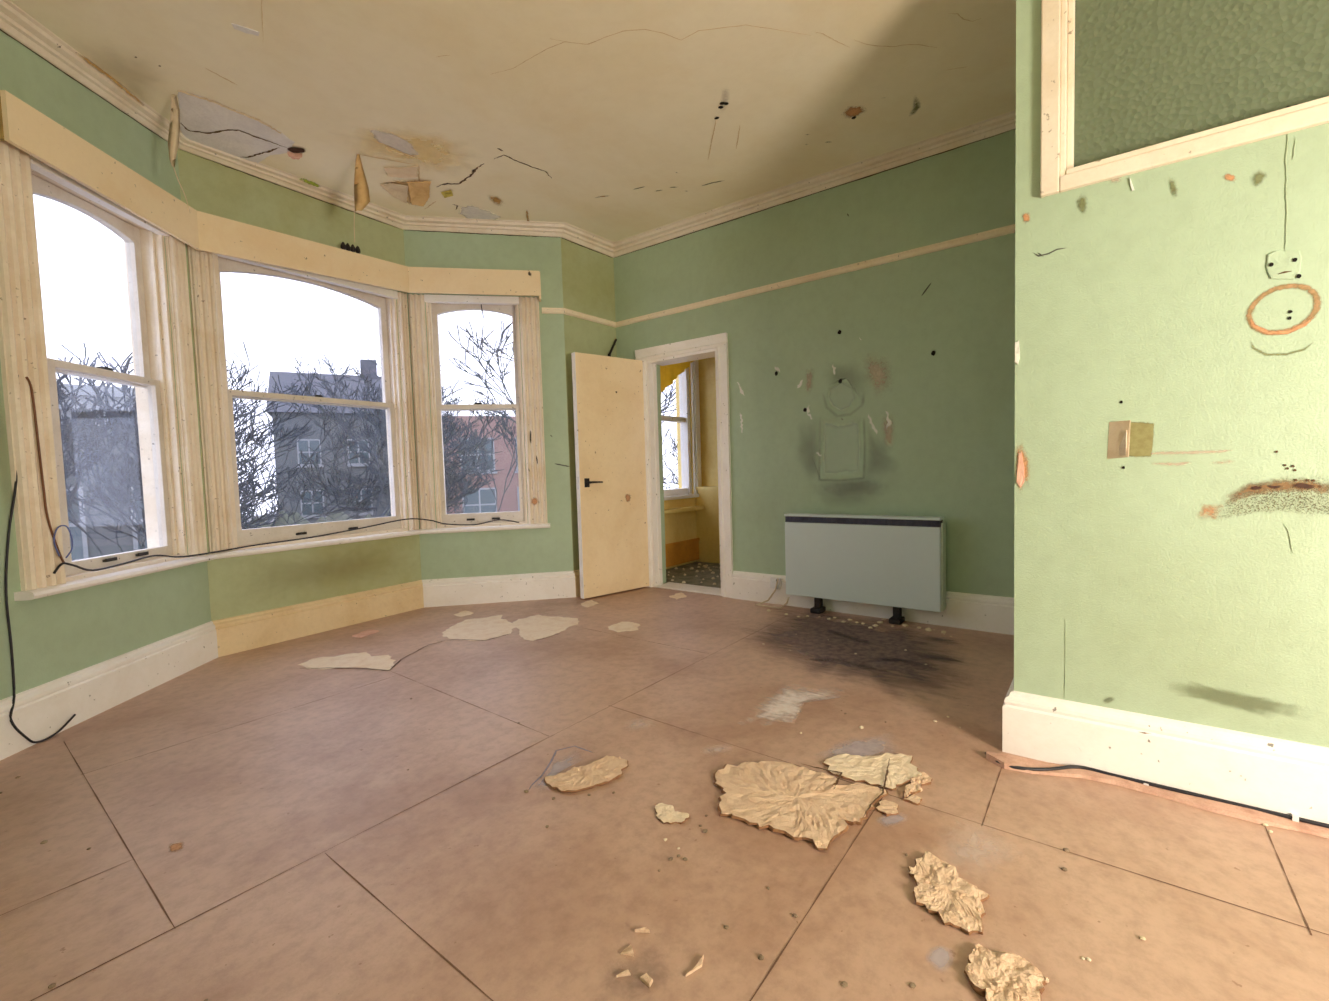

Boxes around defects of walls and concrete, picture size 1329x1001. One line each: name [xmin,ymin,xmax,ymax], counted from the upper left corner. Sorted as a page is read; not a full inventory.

flaking render [168,90,305,167]
peeling [354,131,500,220]
peeling [1016,452,1024,488]